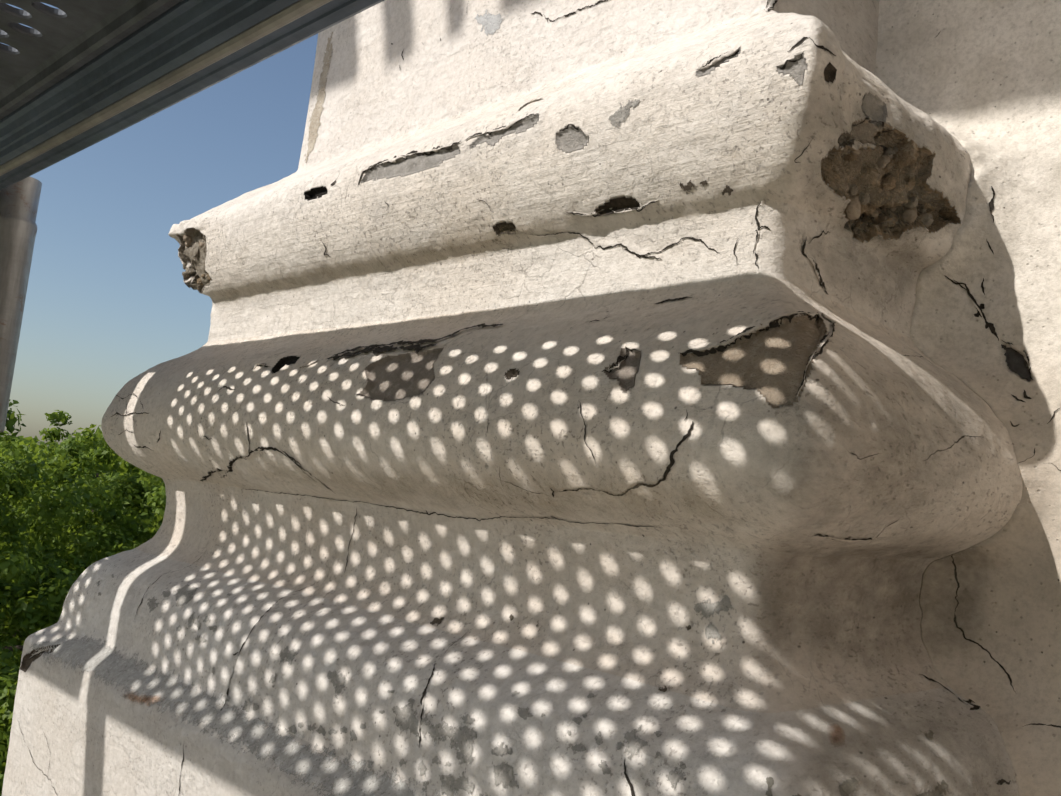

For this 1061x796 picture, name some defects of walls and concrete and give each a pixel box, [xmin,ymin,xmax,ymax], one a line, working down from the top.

crack [531,0,608,22]
spalling [358,98,542,185]
spalling [555,124,589,153]
spalling [821,92,961,243]
spalling [176,228,212,294]
crack [525,203,770,267]
spalling [252,323,503,401]
spalling [678,311,836,408]
crack [200,400,693,573]
crack [924,435,983,461]
crack [1010,390,1061,471]
crack [951,556,1014,690]